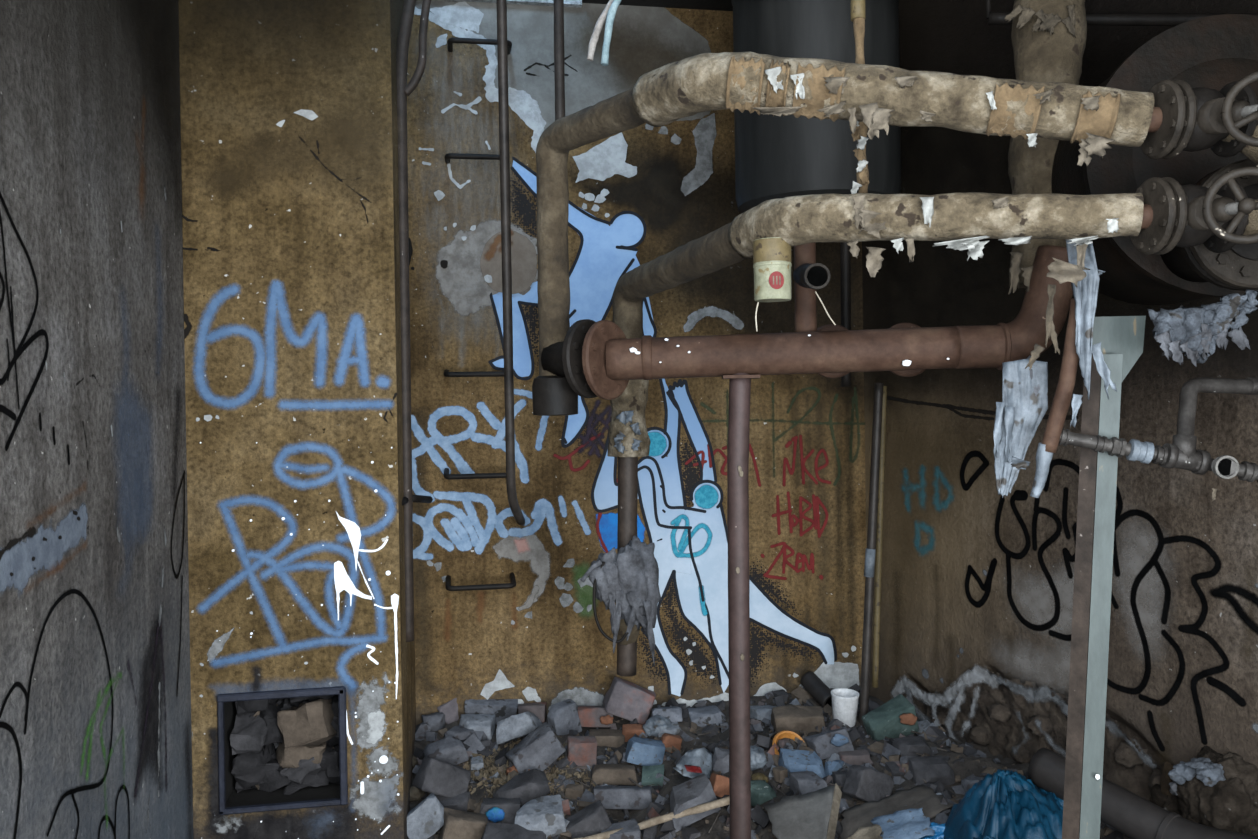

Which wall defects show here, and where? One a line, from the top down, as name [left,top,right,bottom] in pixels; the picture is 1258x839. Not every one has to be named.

peeling [414,0,711,153]
spalling [0,503,88,594]